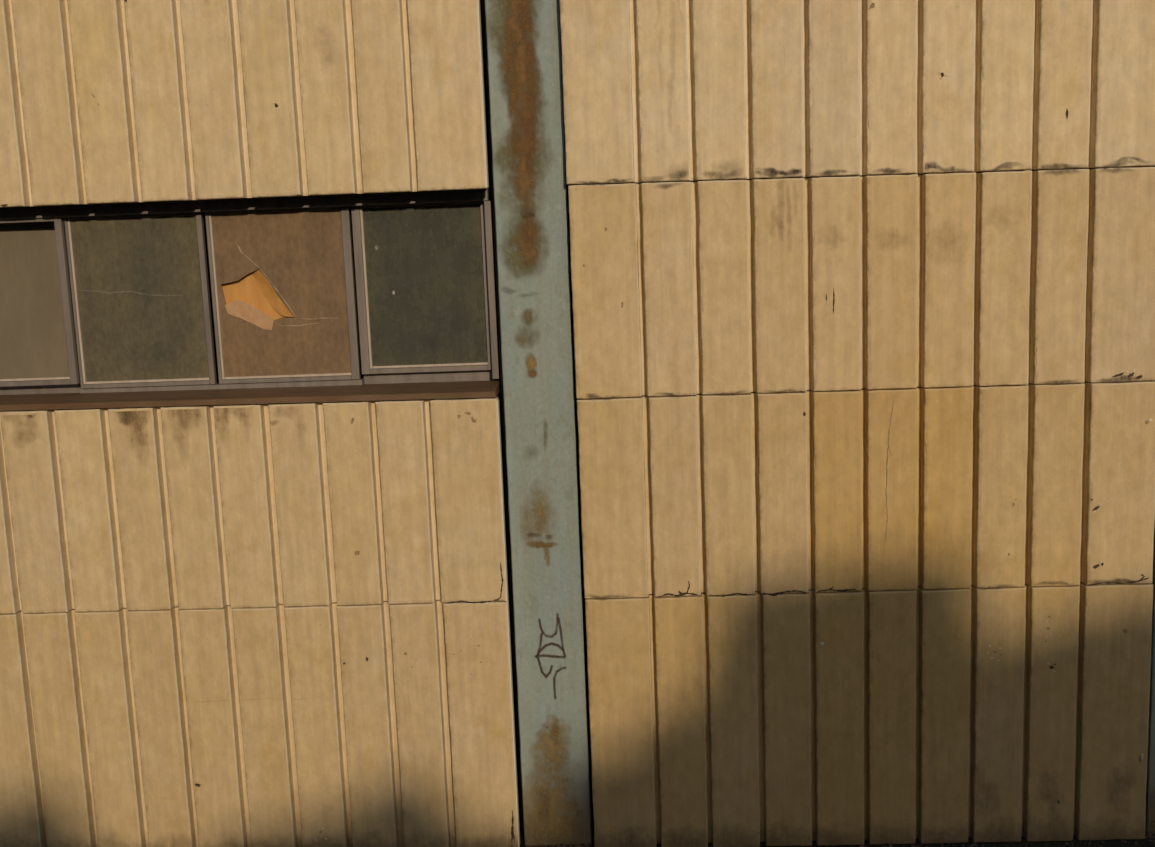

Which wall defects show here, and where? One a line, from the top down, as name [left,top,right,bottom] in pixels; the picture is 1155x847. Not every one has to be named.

corrosion [491,0,544,276]
corrosion [526,355,536,377]
corrosion [528,499,553,564]
crack [886,402,894,536]